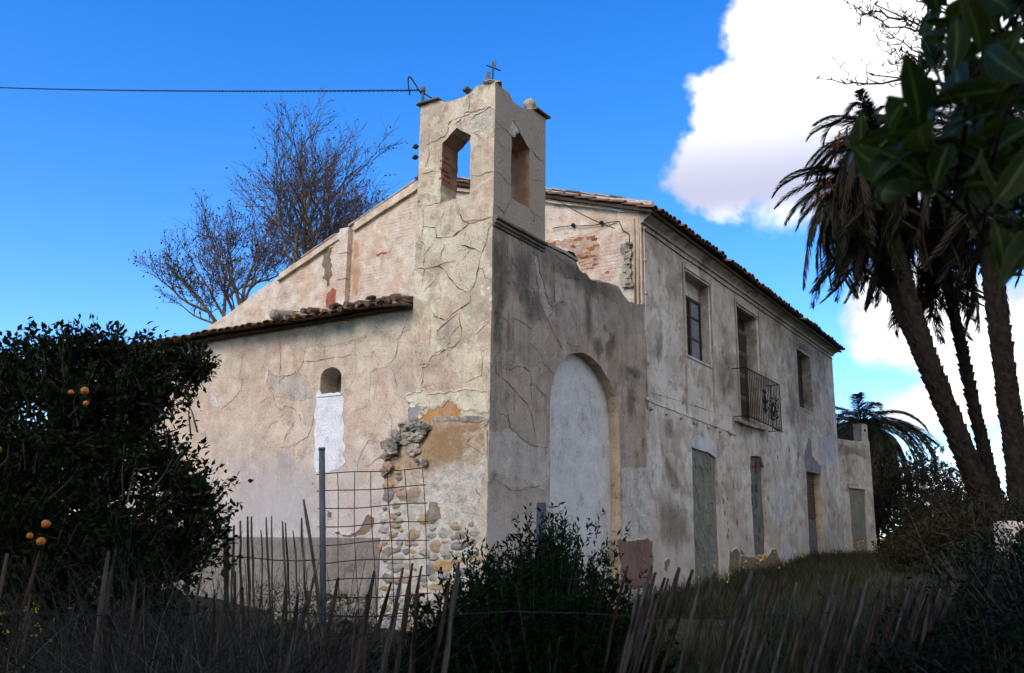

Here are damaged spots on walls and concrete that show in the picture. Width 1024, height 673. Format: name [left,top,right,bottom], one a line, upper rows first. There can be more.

crack [221,287,352,448]
spalling [326,312,549,621]
crack [390,101,578,510]
spalling [545,234,635,289]